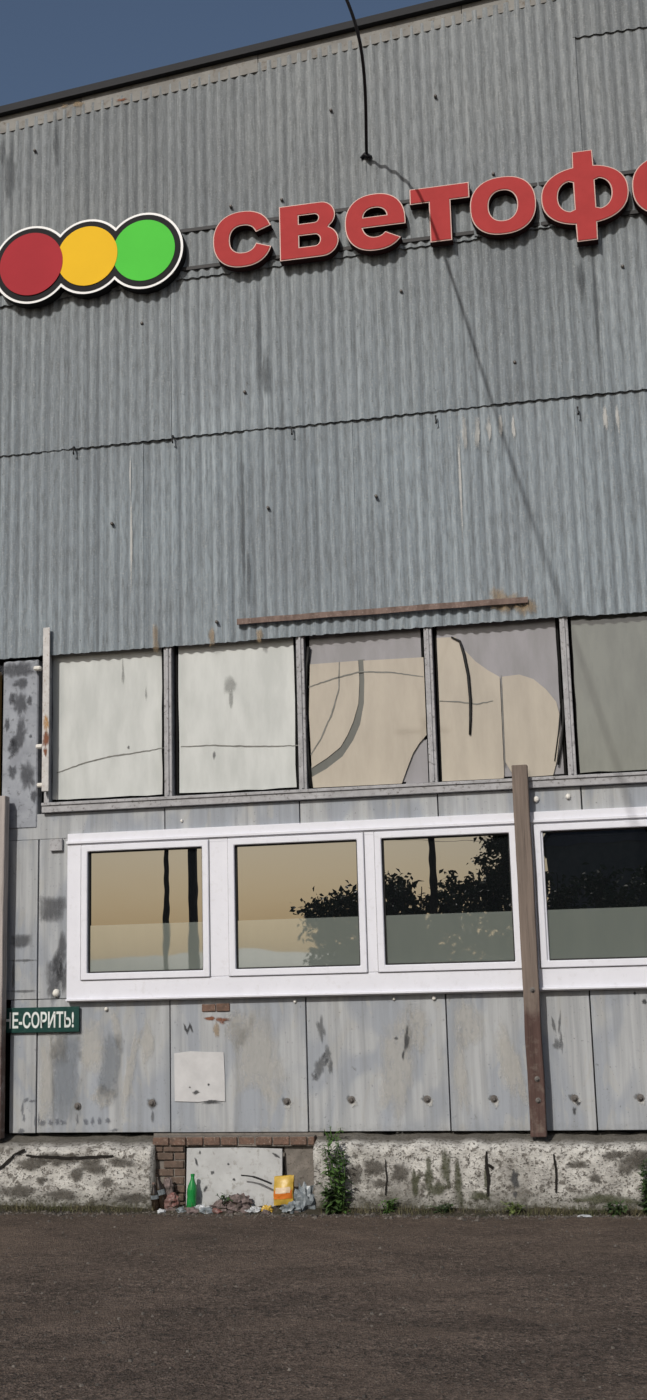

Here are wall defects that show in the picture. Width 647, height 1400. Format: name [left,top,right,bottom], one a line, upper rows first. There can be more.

corrosion [494,593,532,611]
leakage [412,1152,489,1200]
leakage [576,1195,636,1204]